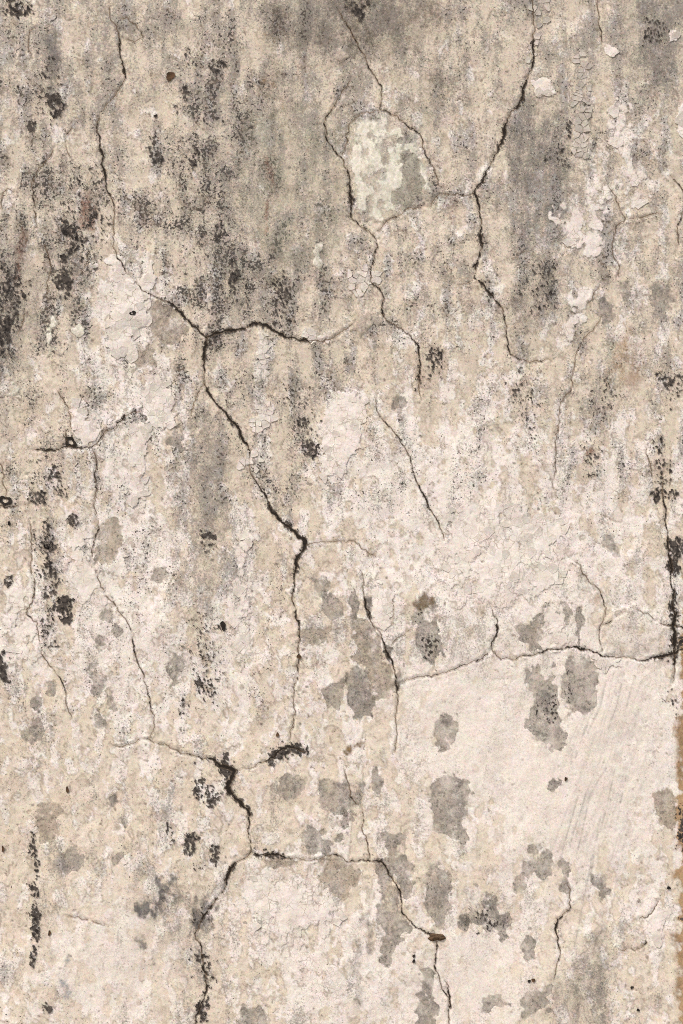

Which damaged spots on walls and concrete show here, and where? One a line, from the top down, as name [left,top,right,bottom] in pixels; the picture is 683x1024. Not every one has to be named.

damp [51,163,115,300]
crack [323,1,683,489]
peeling [531,77,556,97]
peeling [571,52,592,159]
peeling [548,97,652,257]
peeling [104,254,188,513]
damp [27,459,79,653]
crack [35,7,451,1024]
crack [362,450,683,749]
damp [649,436,679,508]
damp [662,536,683,665]
crack [554,886,571,978]